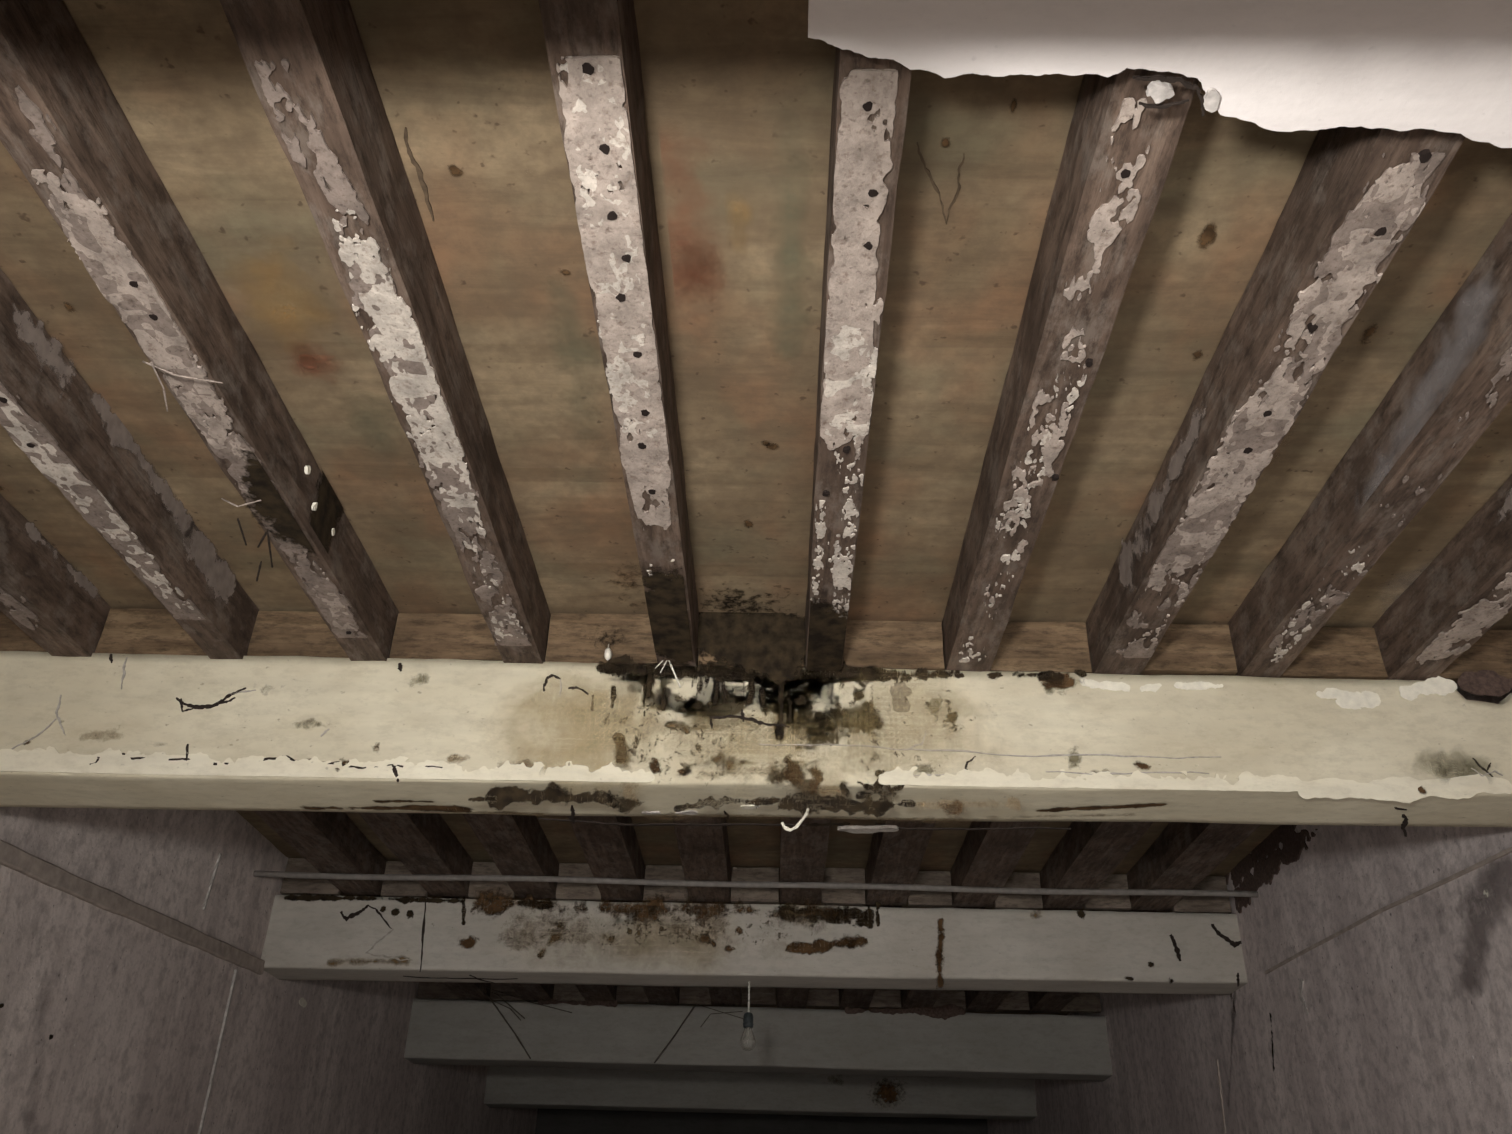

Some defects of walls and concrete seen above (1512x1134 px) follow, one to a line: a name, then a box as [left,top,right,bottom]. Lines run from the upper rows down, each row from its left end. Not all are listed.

peeling [0,85,368,638]
peeling [254,59,532,646]
peeling [556,55,671,530]
flaking render [808,0,1512,663]
water stain [572,567,1020,826]
peeling [1080,677,1223,692]
peeling [1316,688,1381,710]
peeling [1399,572,1512,701]
peeling [0,746,655,783]
peeling [878,764,1512,804]
water stain [284,888,881,949]